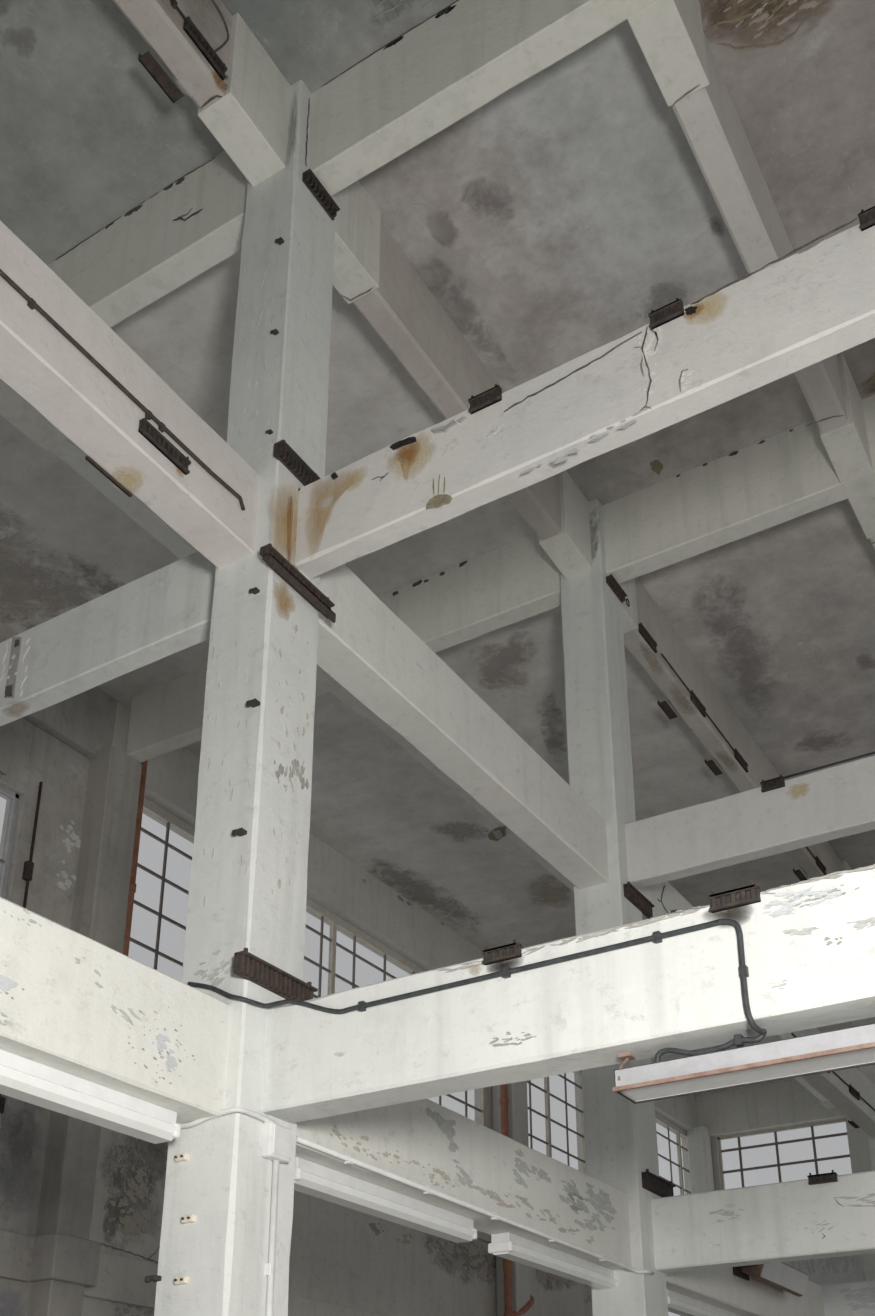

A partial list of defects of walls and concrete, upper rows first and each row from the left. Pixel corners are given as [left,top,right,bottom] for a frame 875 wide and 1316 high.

crack [691,218,857,305]
rust [684,298,718,317]
crack [504,326,694,412]
rust [390,437,426,476]
crack [806,415,844,426]
rust [278,472,361,561]
damp [0,537,88,628]
rust [279,591,292,611]
peeling [330,1107,617,1244]
peeling [369,1222,496,1282]